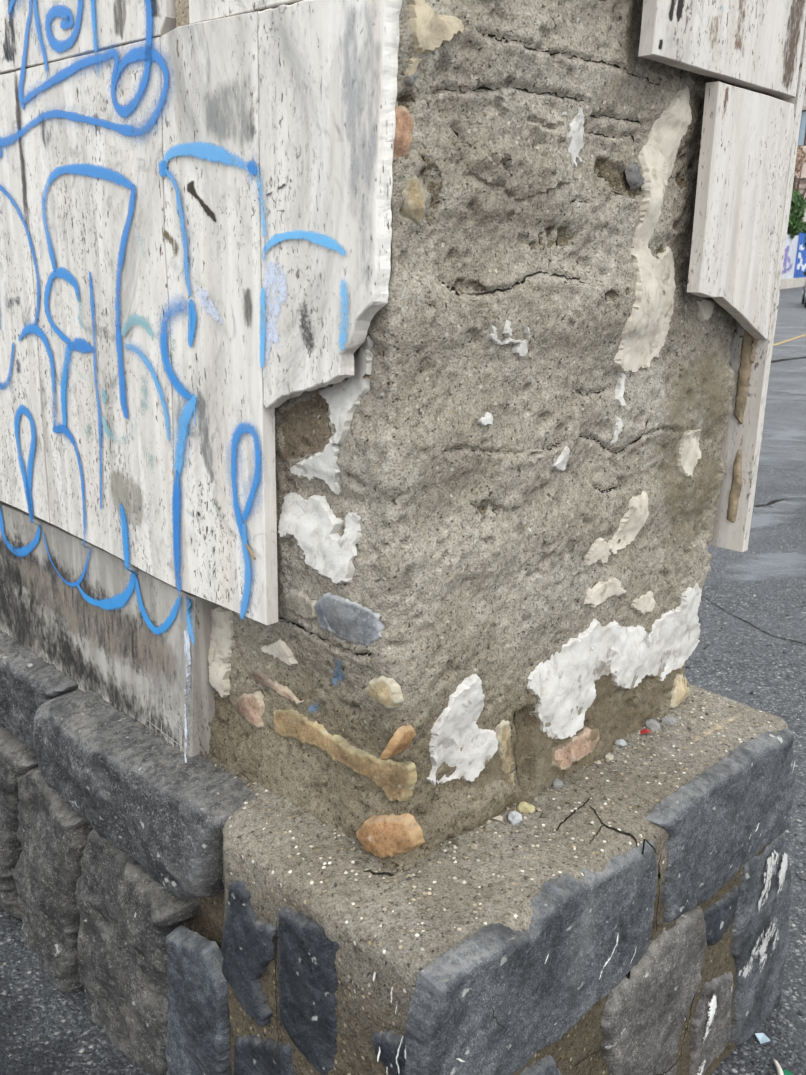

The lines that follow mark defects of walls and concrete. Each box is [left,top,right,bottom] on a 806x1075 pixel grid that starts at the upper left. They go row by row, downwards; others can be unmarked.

flaking render [393,0,464,161]
flaking render [401,154,443,226]
spalling [529,225,572,250]
flaking render [562,85,692,373]
crack [439,271,587,295]
flaking render [278,336,385,647]
crack [592,481,621,493]
crack [542,421,677,454]
flaking render [584,491,649,566]
flaking render [675,429,701,478]
damp [4,548,191,763]
flaking render [234,578,702,858]